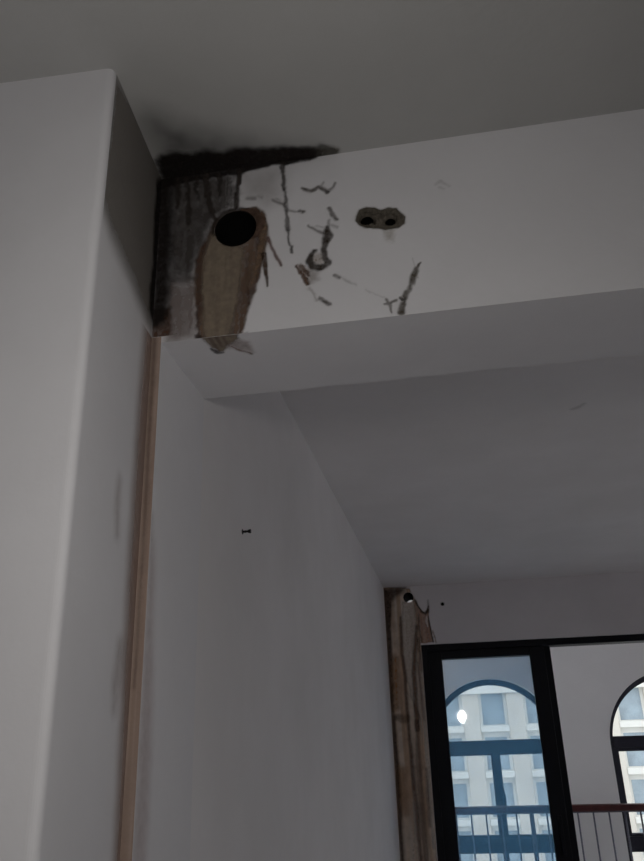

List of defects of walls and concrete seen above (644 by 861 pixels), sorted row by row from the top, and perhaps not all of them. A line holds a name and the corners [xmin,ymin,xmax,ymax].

hole [356,207,405,230]
crack [386,263,420,315]
damp [104,80,338,861]
peeling [414,600,434,643]
damp [384,587,437,861]